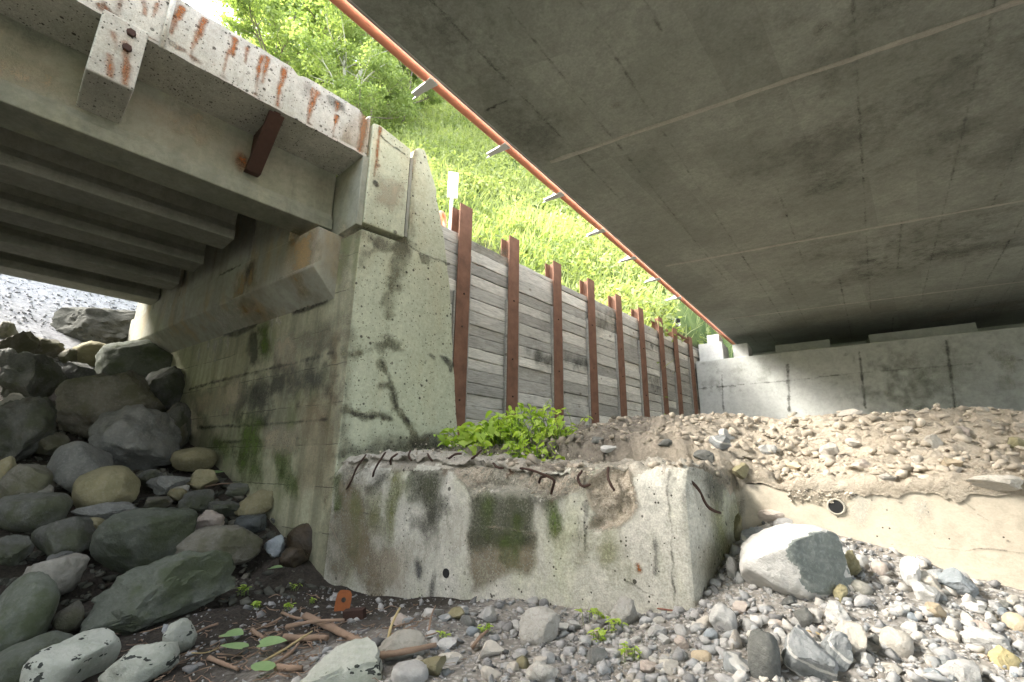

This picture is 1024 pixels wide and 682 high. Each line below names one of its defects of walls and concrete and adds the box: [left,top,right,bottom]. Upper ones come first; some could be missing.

rust [108,34,130,86]
rust [170,5,186,33]
rust [190,17,208,61]
rust [226,36,270,82]
rust [276,67,287,107]
water stain [340,227,411,320]
water stain [194,314,363,494]
spalling [343,441,638,530]
water stain [328,470,535,596]